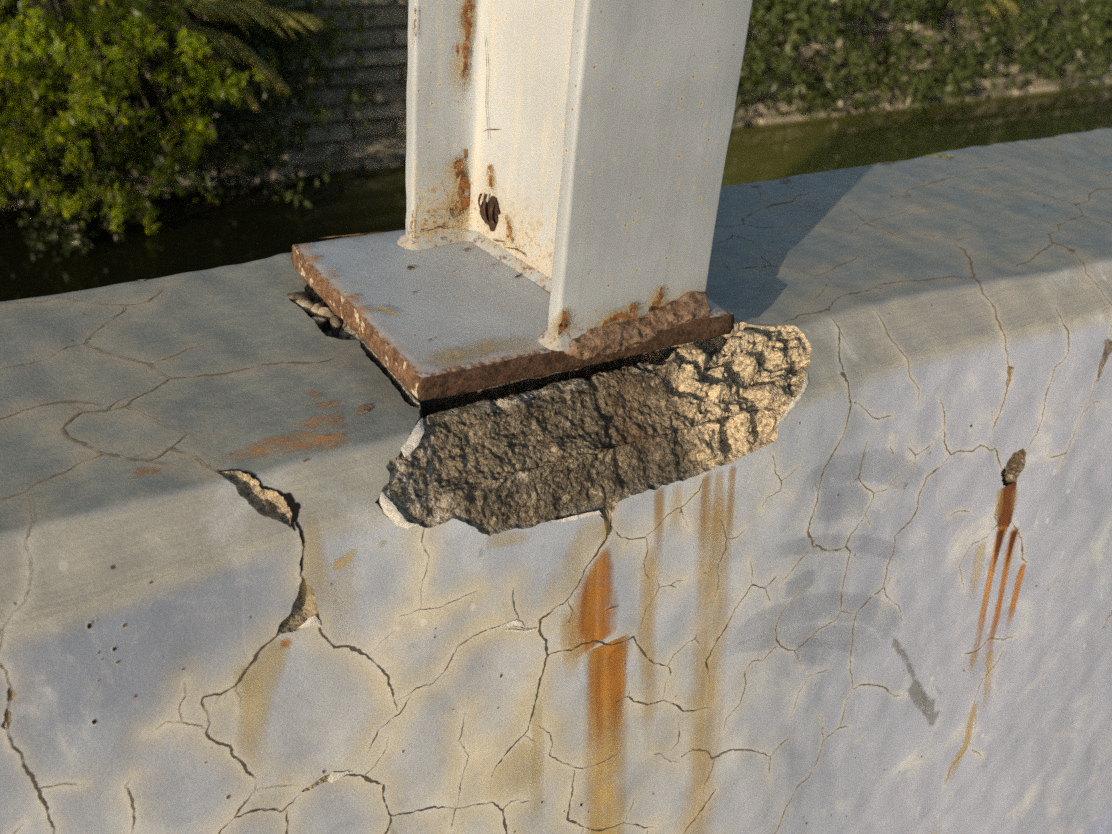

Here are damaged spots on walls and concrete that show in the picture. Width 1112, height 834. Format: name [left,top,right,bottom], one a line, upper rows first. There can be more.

corrosion [456,0,474,103]
corrosion [448,148,513,244]
corrosion [553,310,572,335]
corrosion [600,287,664,327]
spalling [375,291,812,536]
spalling [215,469,300,531]
crack [318,167,1112,834]
crack [0,290,331,834]
spalling [276,576,321,635]
corrosion [974,482,1025,637]
corrosion [579,552,623,834]
corrosion [955,708,975,765]